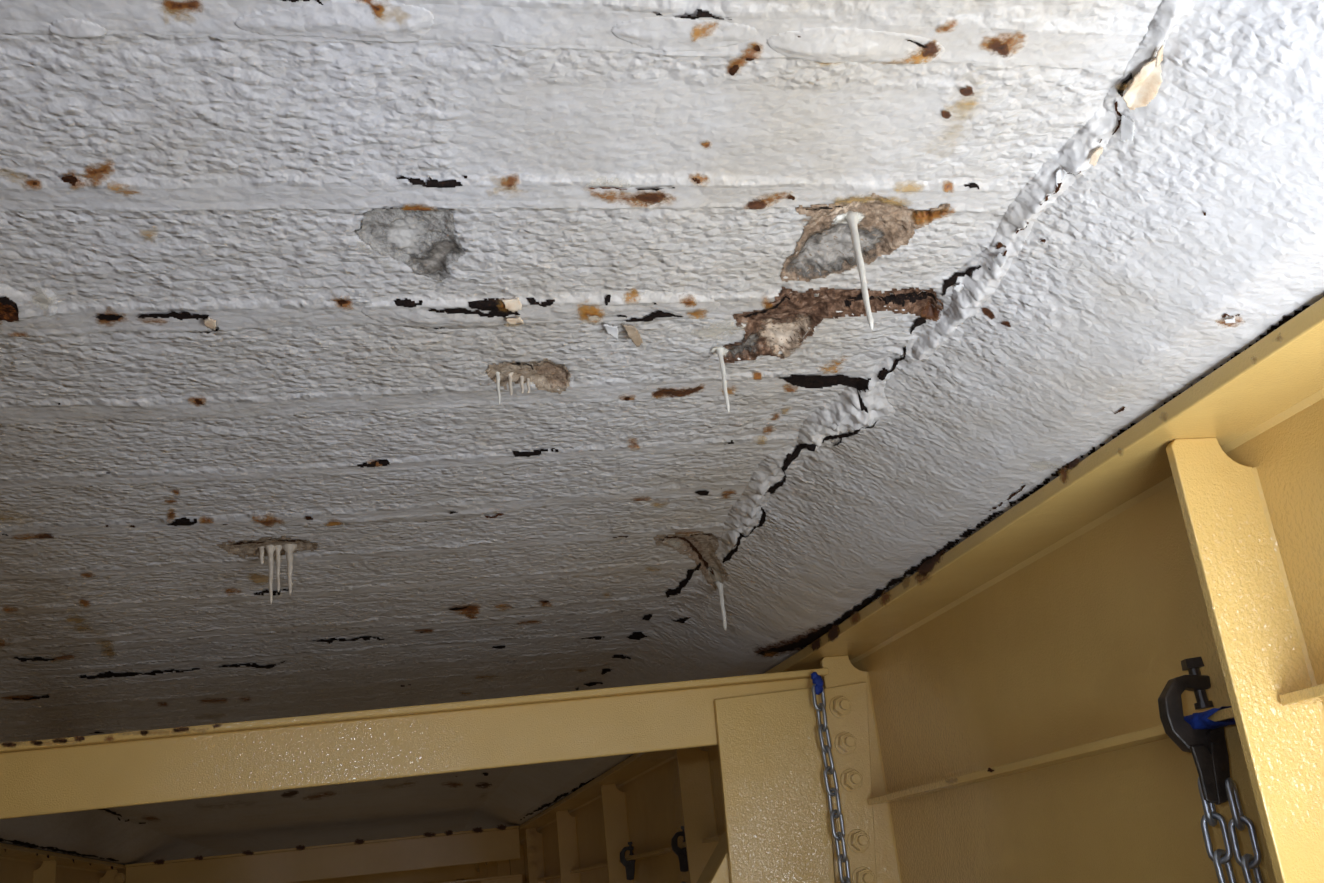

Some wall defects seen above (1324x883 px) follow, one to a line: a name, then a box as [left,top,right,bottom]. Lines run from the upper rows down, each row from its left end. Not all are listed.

crack [656,9,732,20]
corrosion [897,21,956,64]
corrosion [982,33,1024,57]
peeling [1118,45,1163,110]
corrosion [61,162,138,196]
crack [397,176,467,188]
corrosion [590,182,675,207]
spalling [356,205,465,281]
spalling [699,193,955,363]
spalling [486,358,571,404]
crack [575,101,1135,690]
crack [758,294,1324,655]